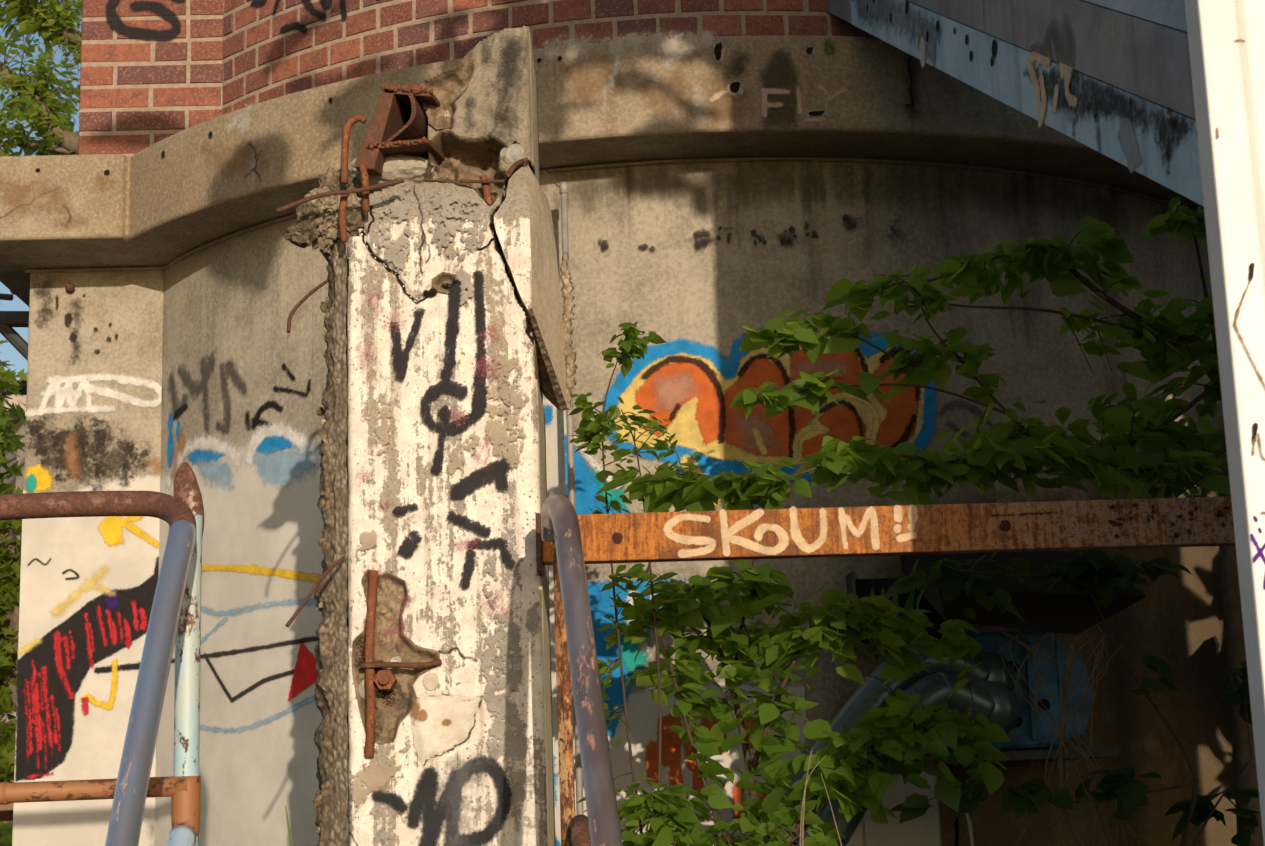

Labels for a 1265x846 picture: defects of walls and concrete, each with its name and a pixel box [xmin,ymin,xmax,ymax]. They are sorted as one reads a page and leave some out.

peeling [855,0,941,67]
peeling [1026,67,1192,174]
crack [357,185,434,304]
crack [477,141,518,263]
damp [693,226,732,250]
damp [751,221,819,246]
crack [515,295,534,345]
damp [27,414,160,490]
spalling [276,49,530,846]
corrosion [991,511,1054,532]
corrosion [1109,504,1204,539]
peeling [479,551,541,817]